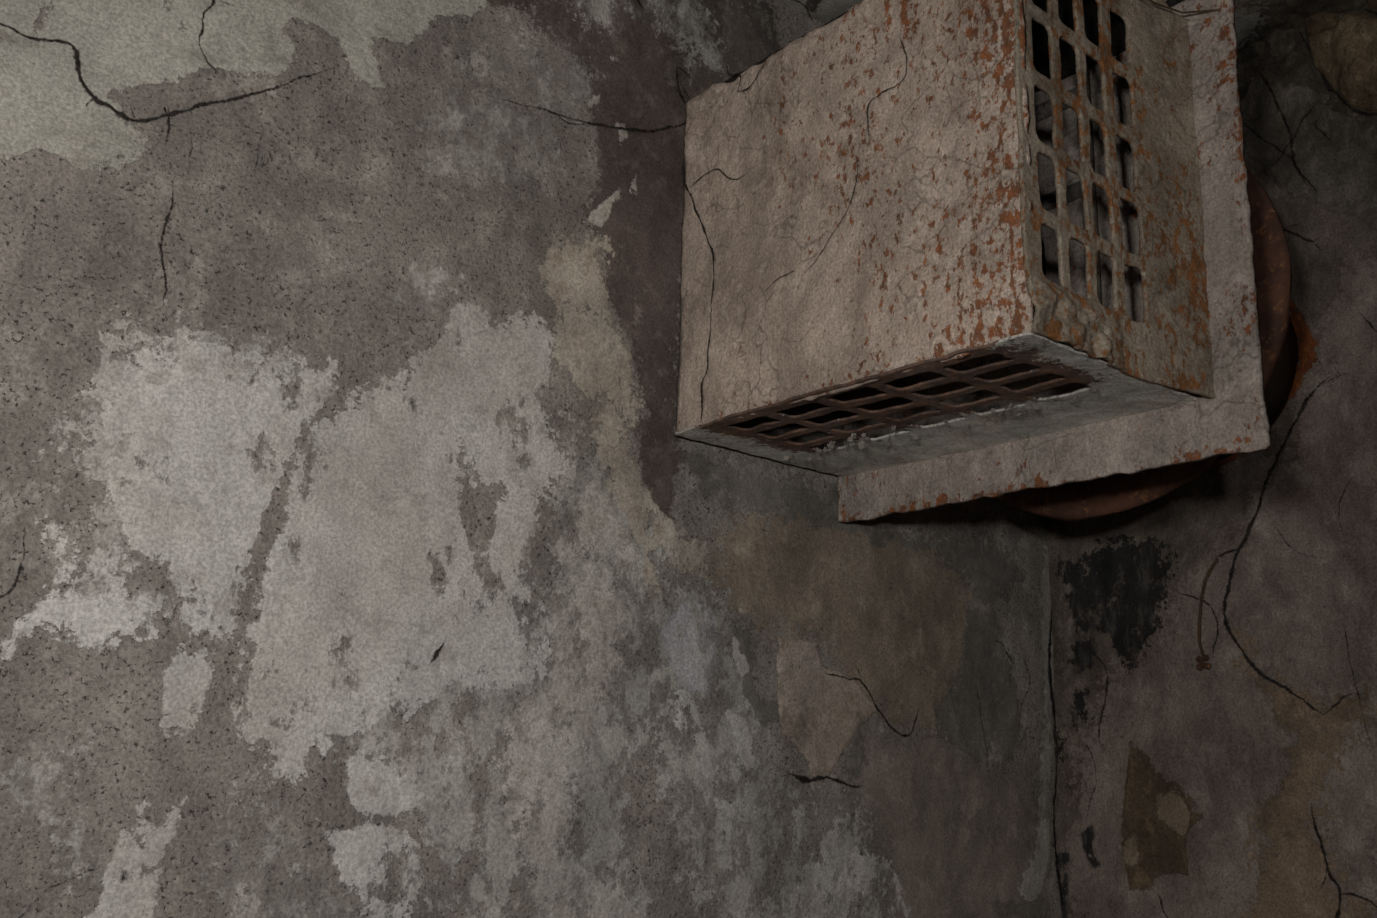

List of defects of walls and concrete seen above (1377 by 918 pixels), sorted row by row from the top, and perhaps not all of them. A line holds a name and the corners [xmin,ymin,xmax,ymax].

crack [0,0,334,157]
crack [159,189,173,301]
water stain [521,0,1099,918]
crack [999,610,1109,918]
water stain [1053,533,1178,764]
crack [1177,371,1374,754]